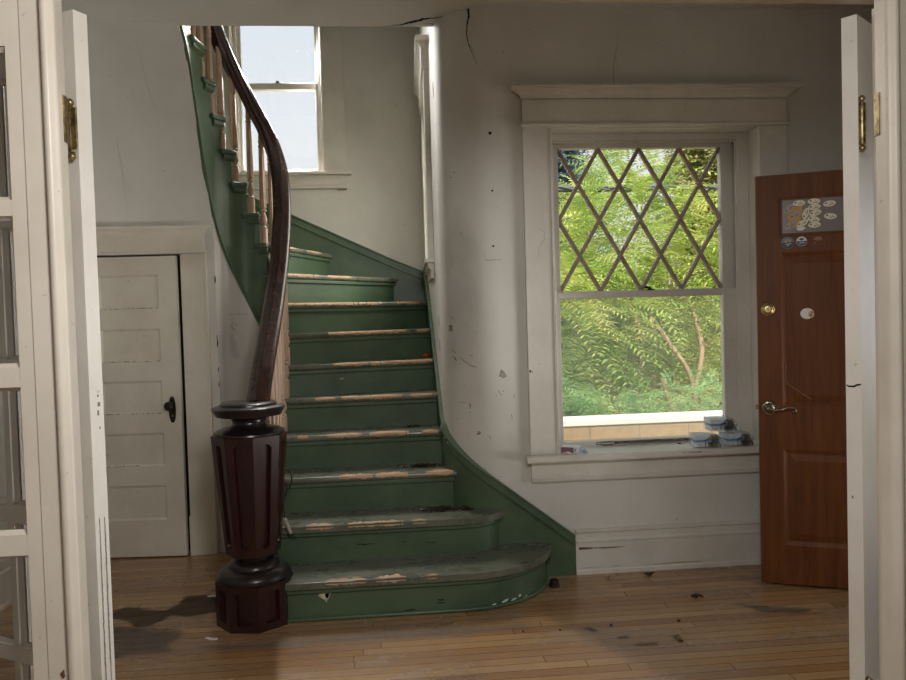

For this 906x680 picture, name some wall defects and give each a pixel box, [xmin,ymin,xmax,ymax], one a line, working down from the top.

crack [384,17,439,27]
crack [466,9,477,64]
peeling [315,393,438,401]
peeling [327,430,409,438]
peeling [339,465,410,479]
peeling [348,509,427,528]
peeling [318,573,406,603]
leakage [113,595,216,656]